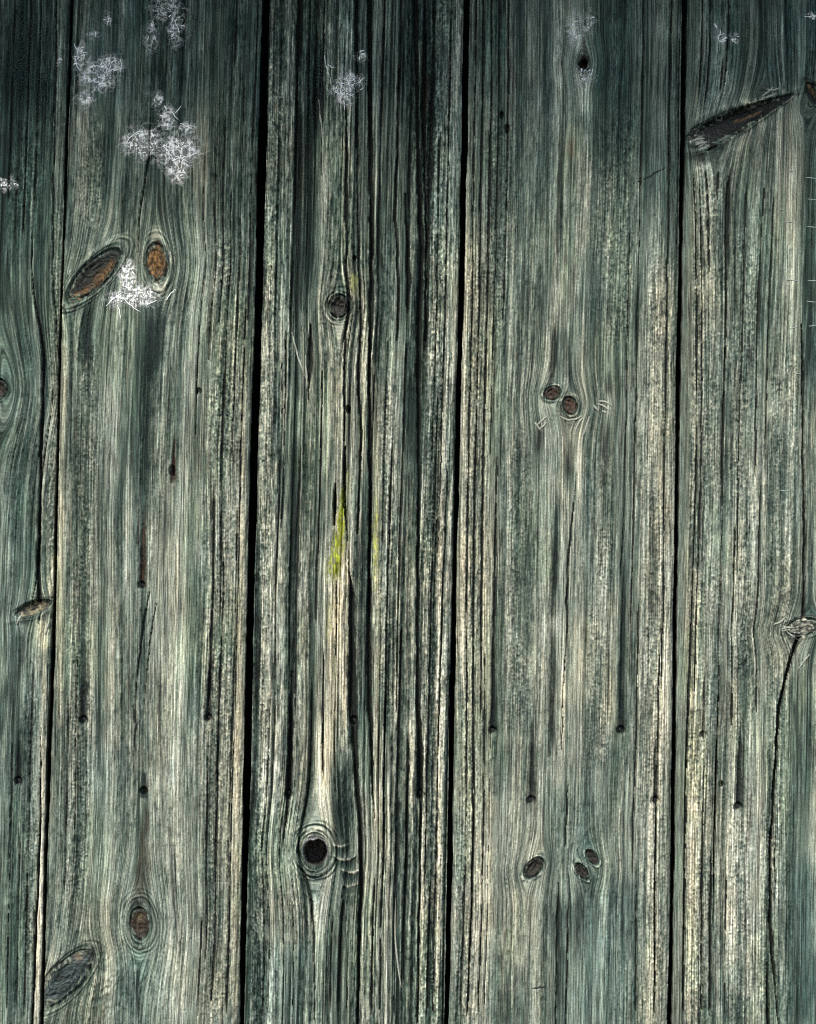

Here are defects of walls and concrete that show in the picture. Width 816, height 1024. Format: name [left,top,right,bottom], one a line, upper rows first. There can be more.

crack [620,0,806,1024]